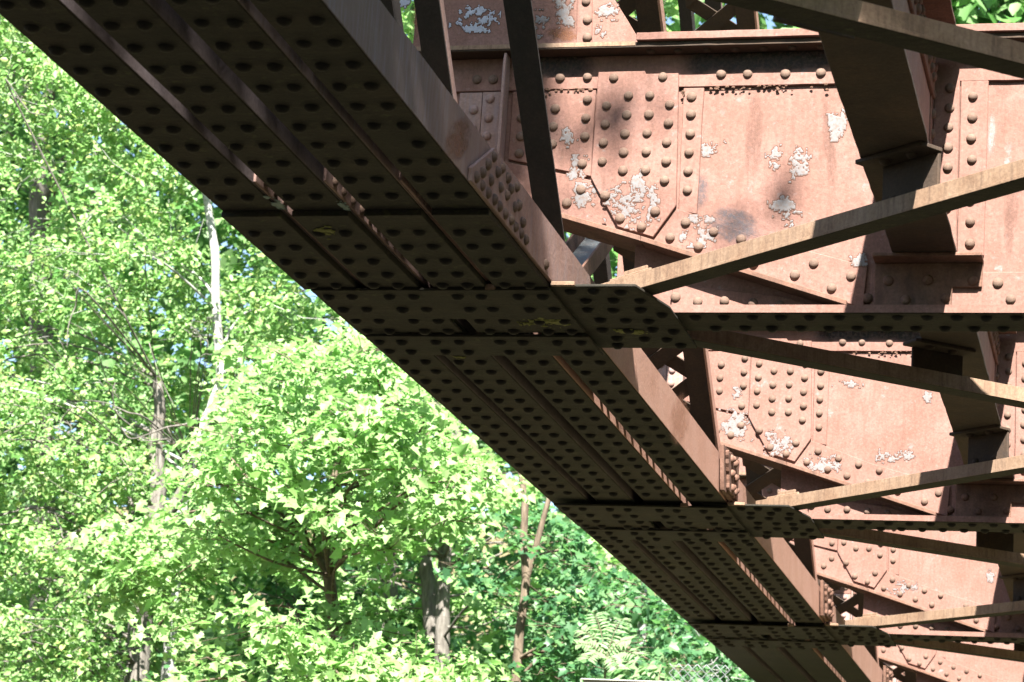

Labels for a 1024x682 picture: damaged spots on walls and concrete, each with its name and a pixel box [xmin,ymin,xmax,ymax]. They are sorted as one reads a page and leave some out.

peeling [448,4,502,34]
peeling [534,0,576,40]
peeling [594,2,620,38]
peeling [825,108,847,142]
peeling [701,139,727,158]
peeling [559,126,661,231]
peeling [764,143,813,228]
peeling [679,214,719,249]
peeling [718,386,842,474]
peeling [875,447,916,464]